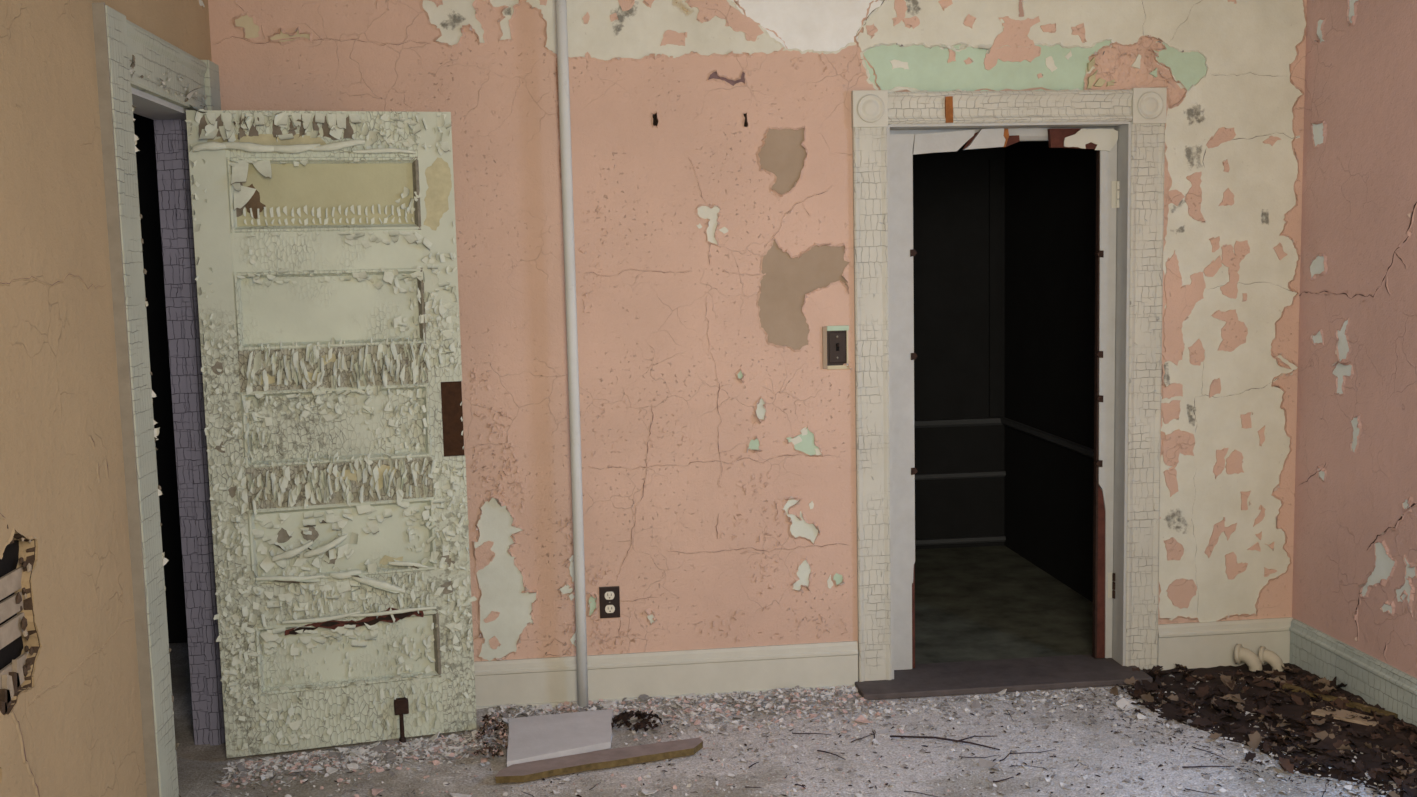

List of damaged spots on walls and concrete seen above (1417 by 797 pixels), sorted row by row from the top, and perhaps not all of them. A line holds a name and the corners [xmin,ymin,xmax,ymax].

peeling [185,88,538,753]
crack [583,186,849,602]
peeling [419,0,1328,625]
crack [1207,201,1417,301]
peeling [1310,317,1354,396]
spalling [0,524,42,719]
peeling [1358,539,1417,618]
crack [1366,502,1417,551]